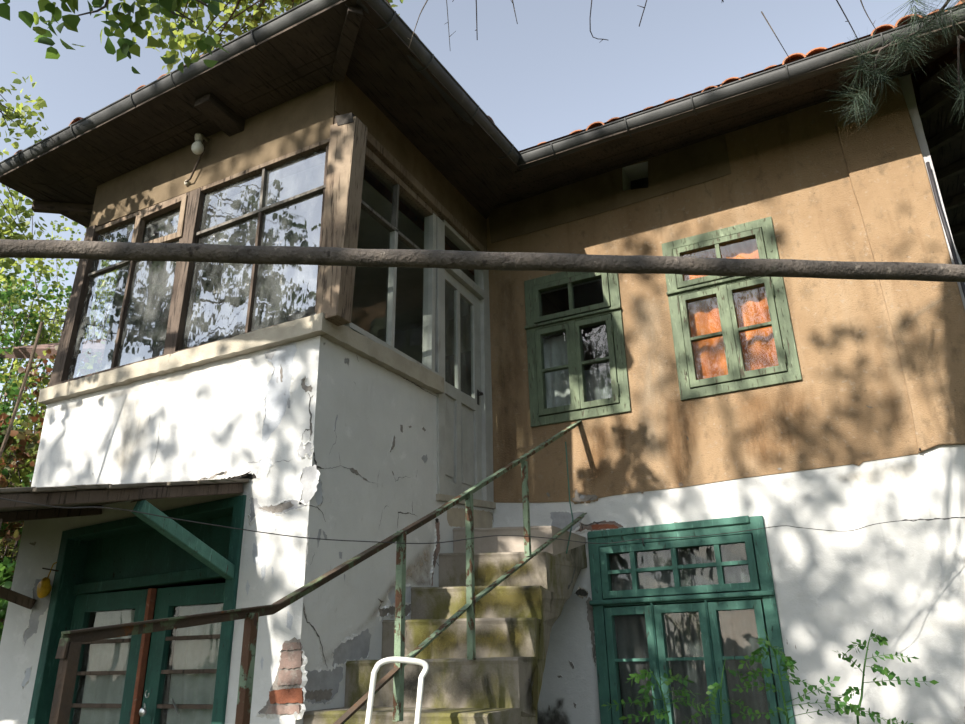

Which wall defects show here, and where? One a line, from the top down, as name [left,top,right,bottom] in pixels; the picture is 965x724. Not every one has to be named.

peeling [200,342,313,483]
crack [302,393,417,483]
flaking render [247,441,323,527]
crack [305,501,326,570]
flaking render [556,489,627,535]
flaking render [256,611,371,720]
crack [303,603,326,664]
flaking render [377,583,412,621]